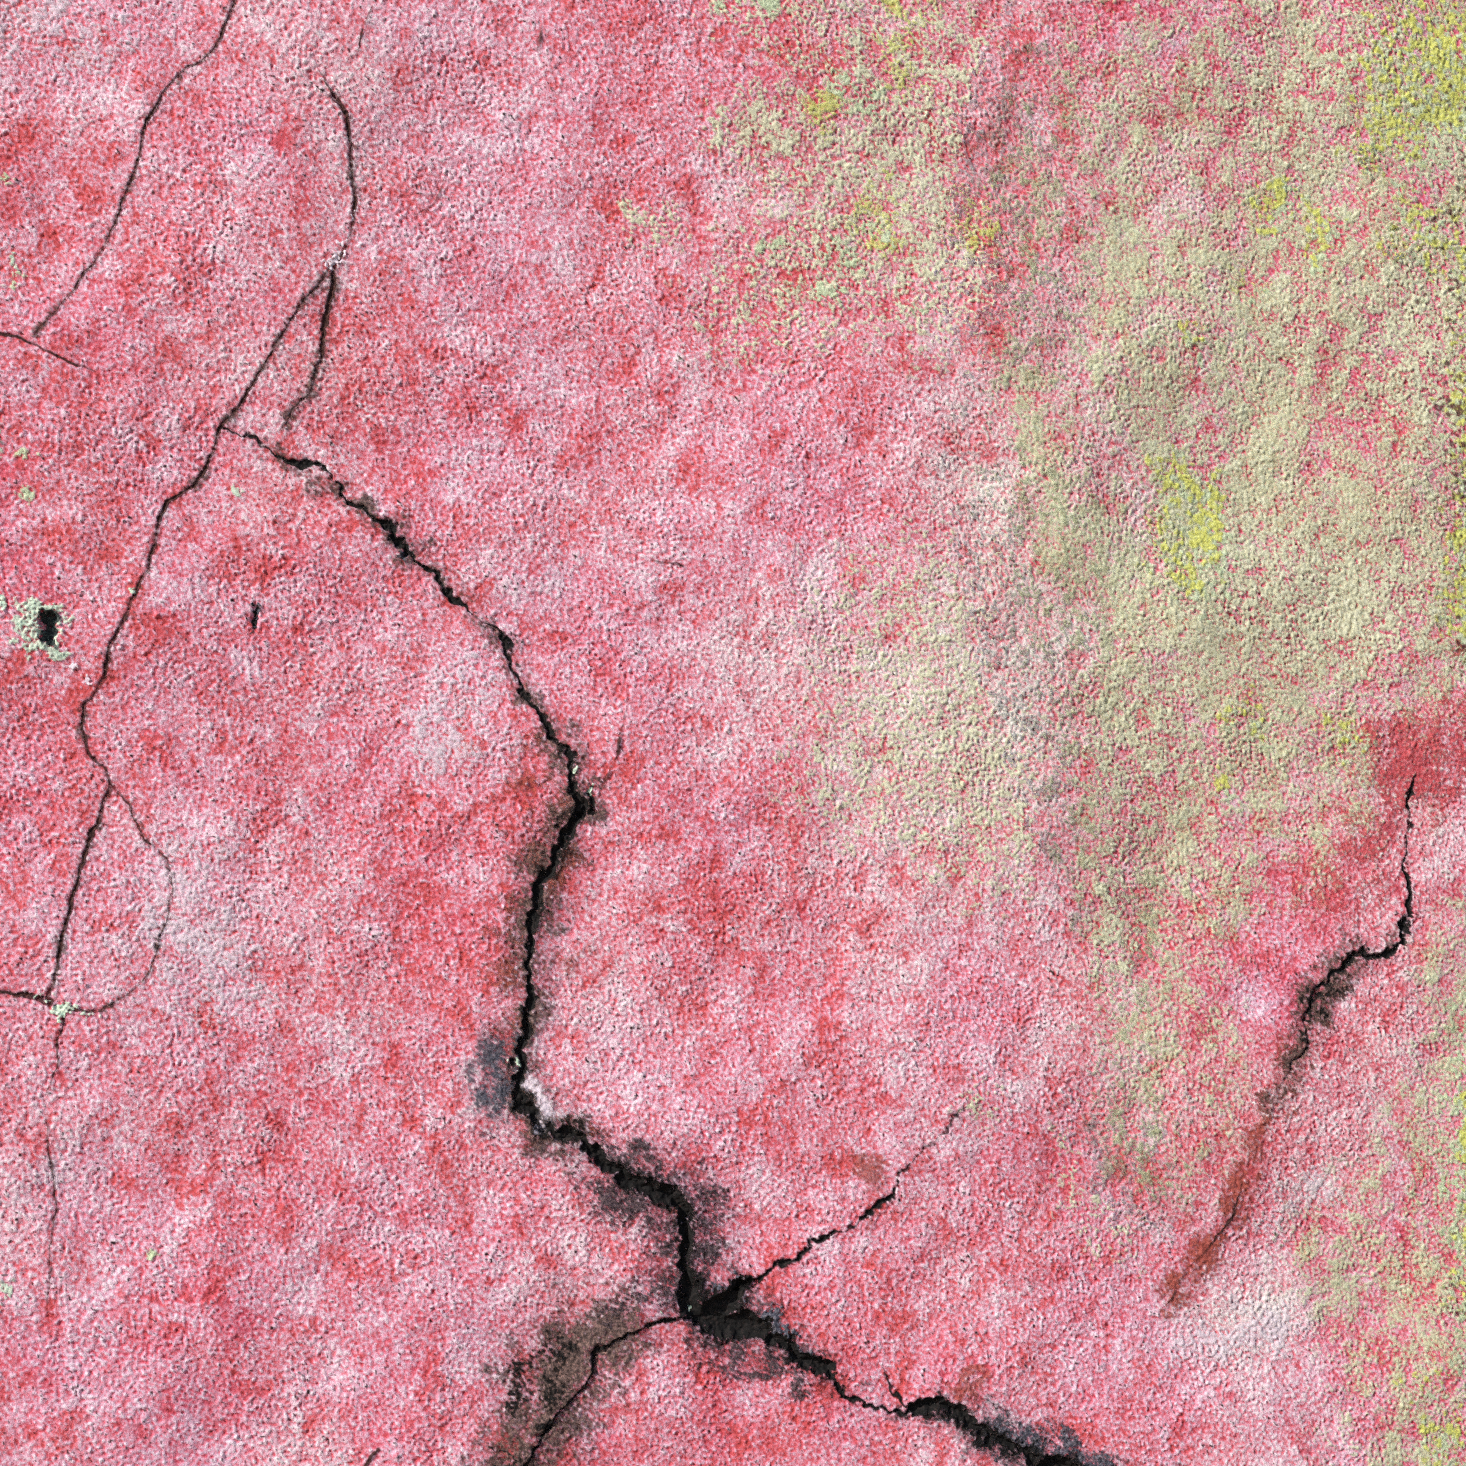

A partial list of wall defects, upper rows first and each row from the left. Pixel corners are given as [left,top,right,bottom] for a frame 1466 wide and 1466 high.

crack [0,0,236,370]
crack [0,77,1128,1466]
crack [1155,775,1419,1318]